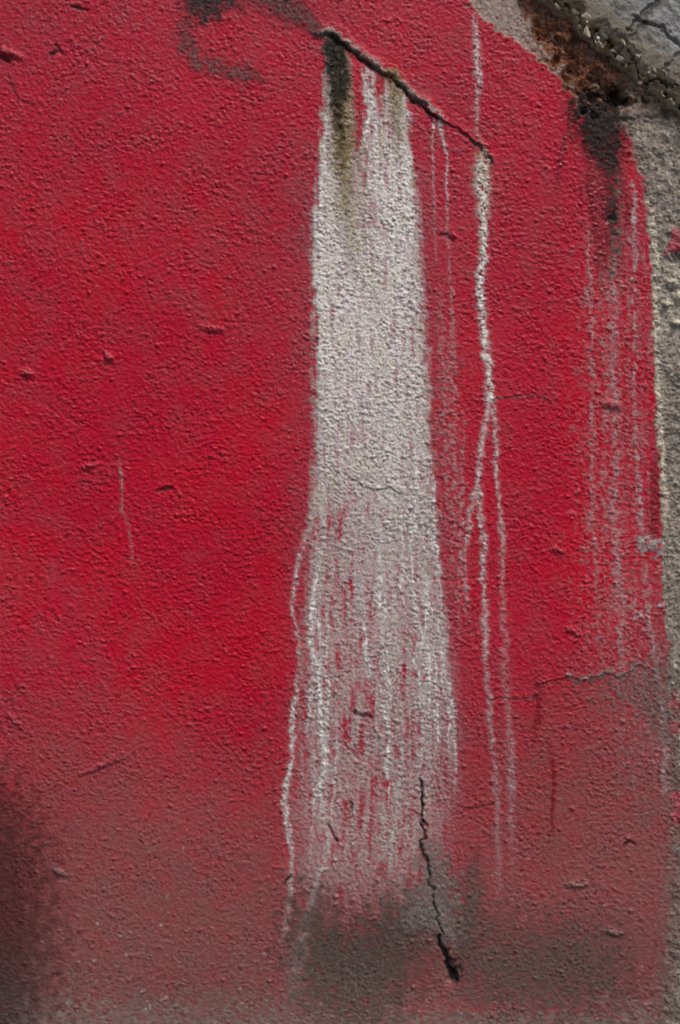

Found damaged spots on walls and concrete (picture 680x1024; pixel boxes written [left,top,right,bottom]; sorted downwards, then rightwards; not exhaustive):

crack [320,27,493,163]
rust [524,13,613,100]
water stain [569,79,638,329]
water stain [283,33,456,880]
peeling [465,0,680,826]
crack [419,779,433,889]
water stain [287,890,423,1023]
crack [435,929,459,984]